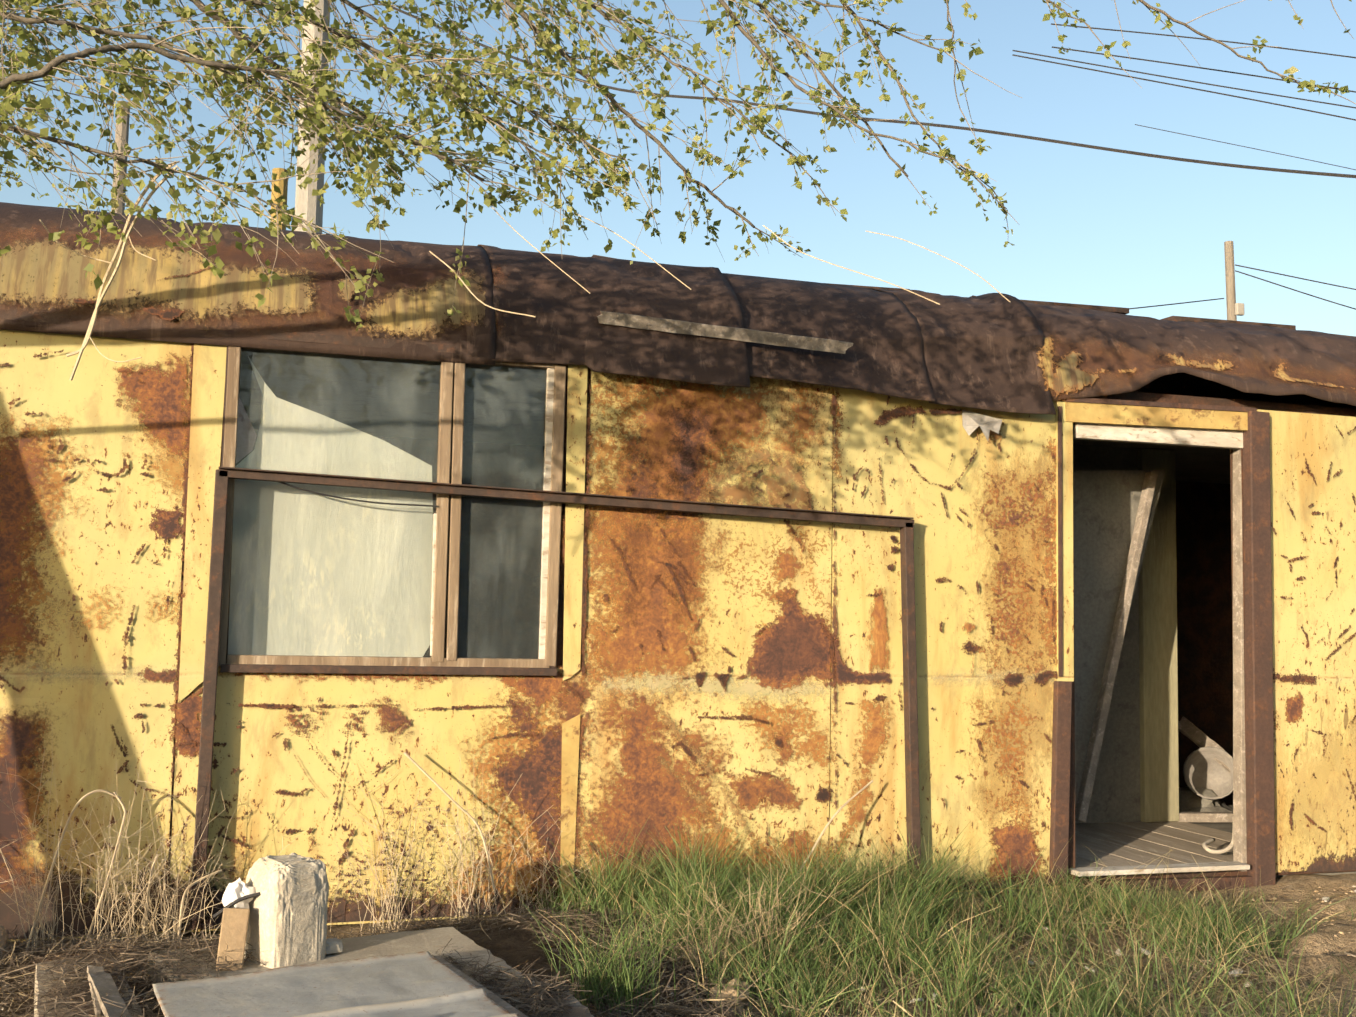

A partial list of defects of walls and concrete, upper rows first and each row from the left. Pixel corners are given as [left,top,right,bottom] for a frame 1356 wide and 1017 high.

peeling [0,237,321,331]
peeling [337,269,496,341]
corrosion [0,412,252,939]
corrosion [113,343,215,786]
corrosion [219,373,1061,923]
corrosion [1273,672,1356,874]